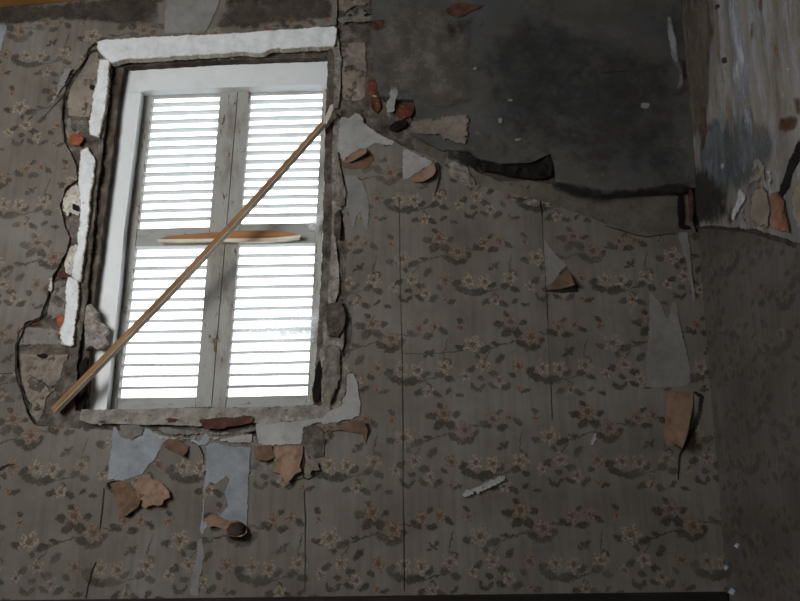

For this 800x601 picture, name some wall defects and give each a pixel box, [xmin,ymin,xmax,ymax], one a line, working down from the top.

peeling [668,18,678,62]
crack [40,49,98,142]
peeling [65,52,99,146]
flaking render [337,0,553,189]
spalling [675,192,689,229]
flaking render [732,139,800,232]
flaking render [19,185,85,421]
flaking render [75,304,111,411]
flaking render [120,424,144,440]
flaking render [159,415,255,436]
flaking render [303,425,325,458]